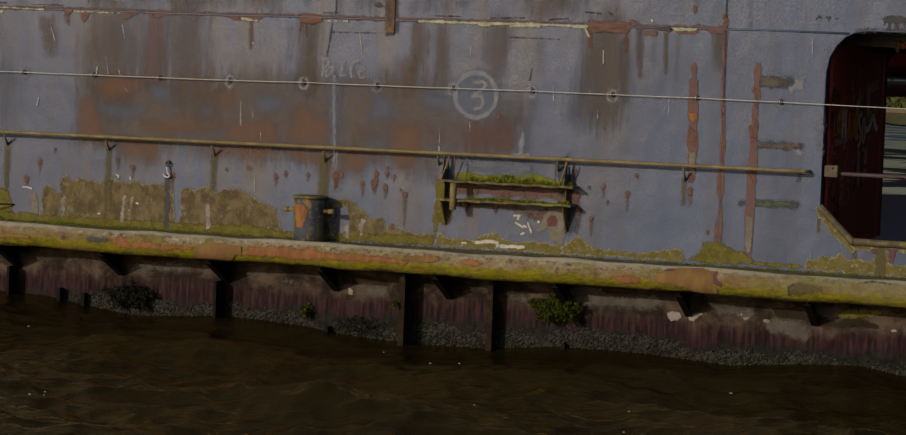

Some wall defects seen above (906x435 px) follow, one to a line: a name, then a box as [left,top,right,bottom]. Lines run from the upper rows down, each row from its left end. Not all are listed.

corrosion [0,0,728,245]
corrosion [744,63,762,258]
peeling [22,174,285,233]
peeling [324,198,436,241]
corrosion [109,236,407,266]